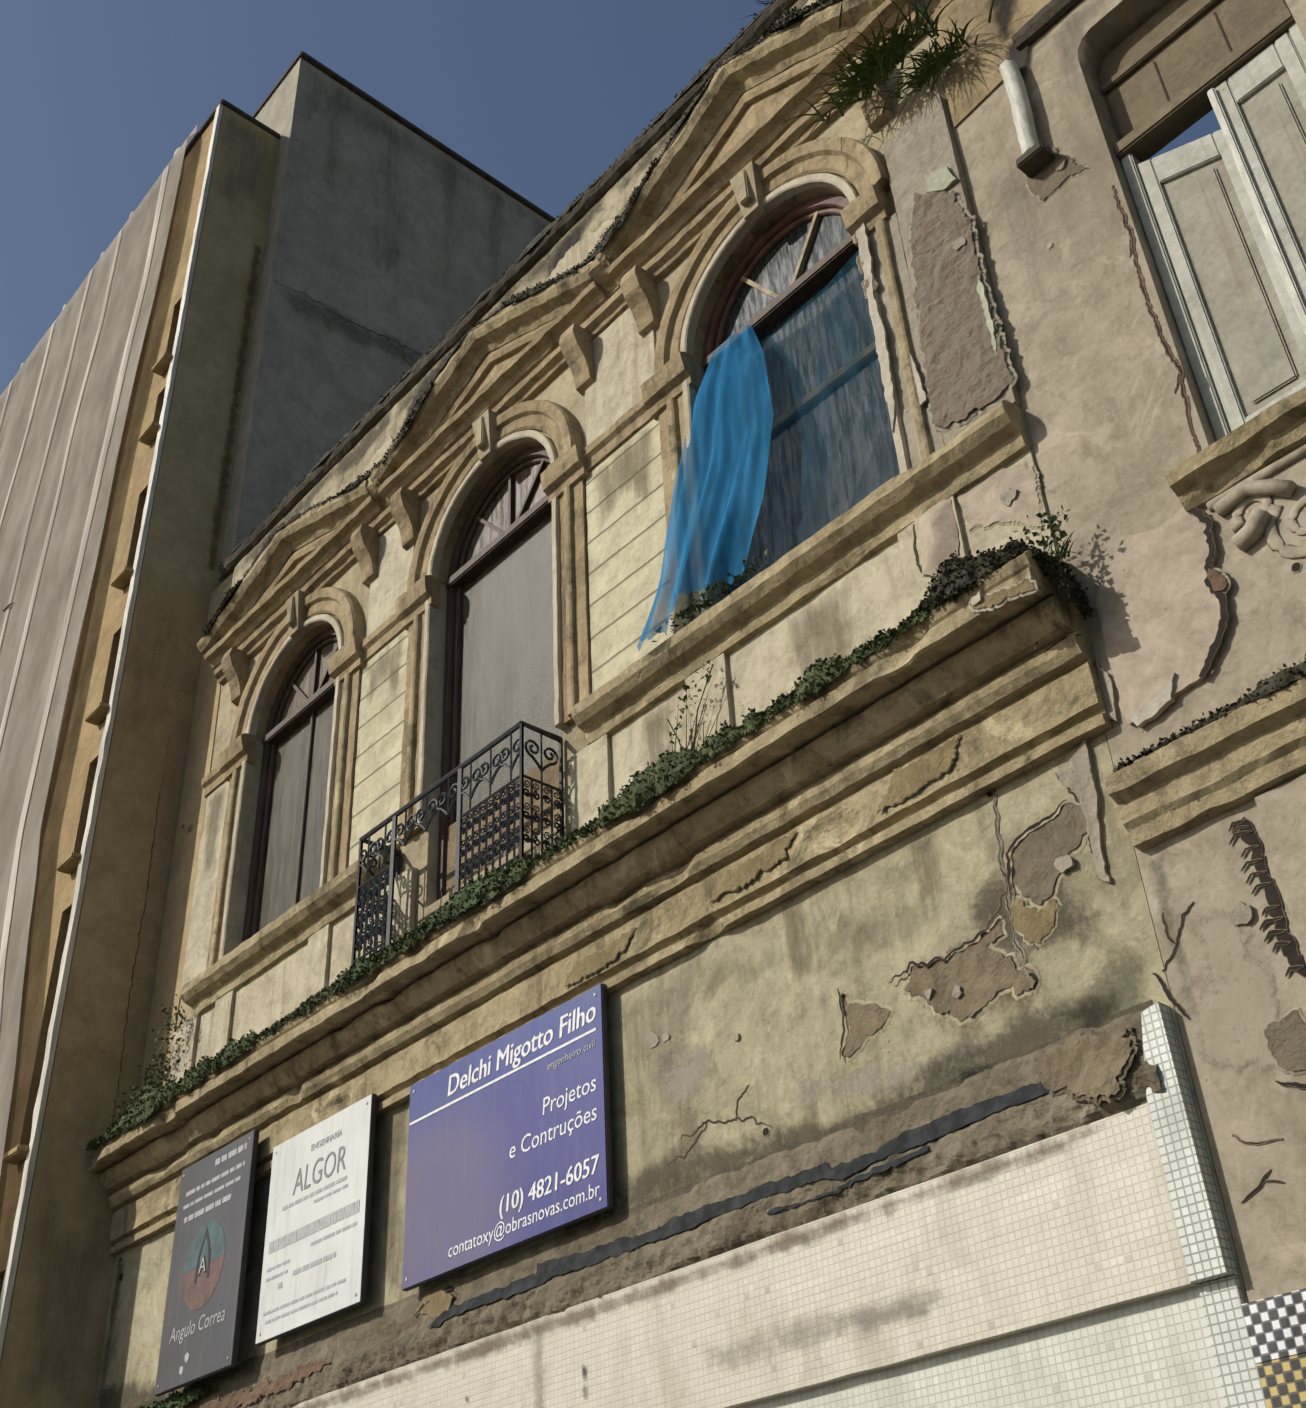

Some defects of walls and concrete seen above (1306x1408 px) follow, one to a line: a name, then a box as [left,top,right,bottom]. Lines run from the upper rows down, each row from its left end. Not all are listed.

leakage [991,0,1028,78]
crack [275,280,423,366]
flaking render [853,166,1018,433]
crack [1111,185,1201,453]
spalling [1188,507,1231,678]
peeling [1131,673,1177,728]
flaking render [889,738,1112,1027]
crack [667,1085,772,1165]
flaking render [837,988,895,1062]
spalling [1034,1024,1138,1107]
crack [1152,901,1194,1020]
flaking render [1190,901,1306,1075]